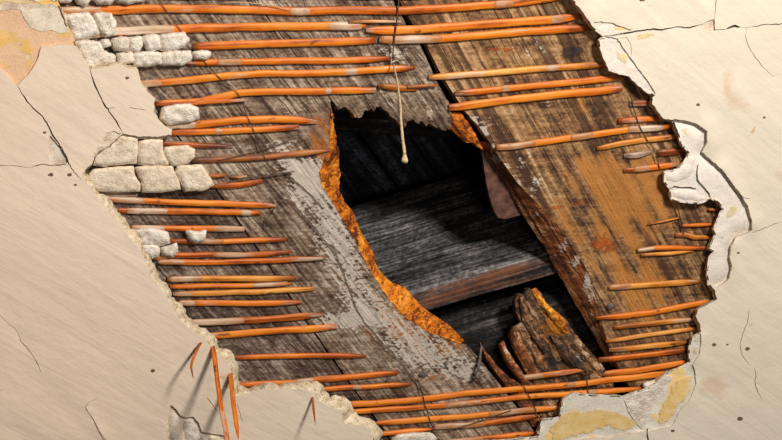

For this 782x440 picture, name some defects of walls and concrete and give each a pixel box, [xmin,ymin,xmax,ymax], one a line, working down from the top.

flaking render [0,0,76,85]
flaking render [594,22,655,94]
crack [610,4,782,76]
flaking render [701,19,715,31]
flaking render [43,131,77,186]
crack [0,70,143,180]
flaking render [662,120,751,287]
flaking render [500,333,701,440]
flaking render [166,406,224,440]